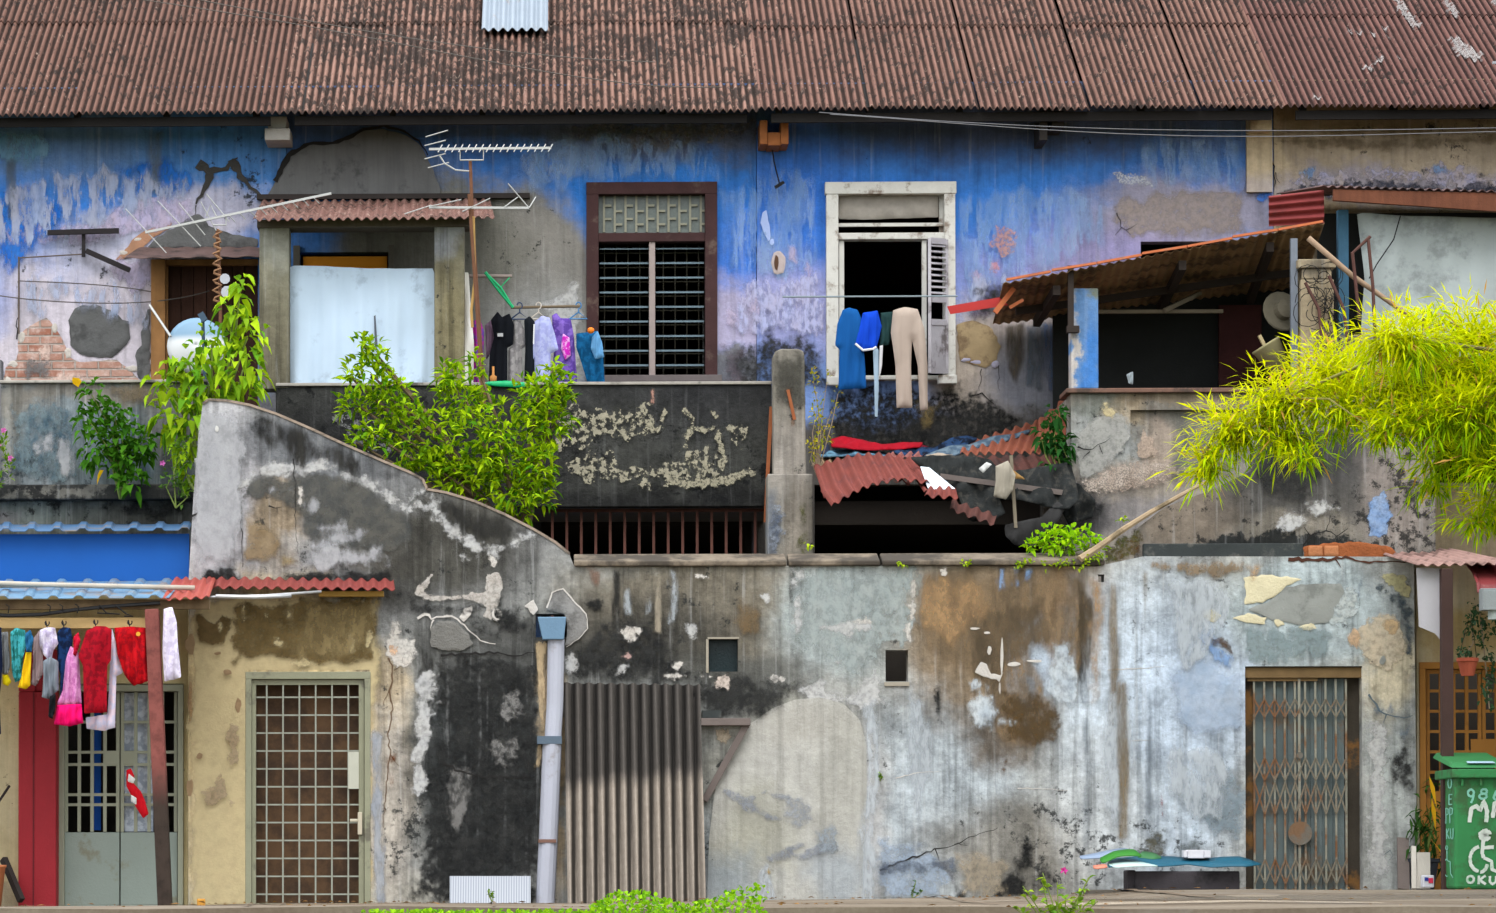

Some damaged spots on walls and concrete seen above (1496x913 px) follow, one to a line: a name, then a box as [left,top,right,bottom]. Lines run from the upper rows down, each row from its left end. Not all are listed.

crack [195,157,260,214]
spalling [0,159,193,380]
water stain [724,330,1018,452]
peeling [555,402,756,490]
peeling [386,622,417,668]
flaking render [415,572,503,622]
peeling [1210,575,1405,671]
spalling [1303,542,1411,598]
water stain [411,654,539,903]
water stain [565,571,1054,900]
water stain [920,561,1246,839]
water stain [1137,830,1200,856]